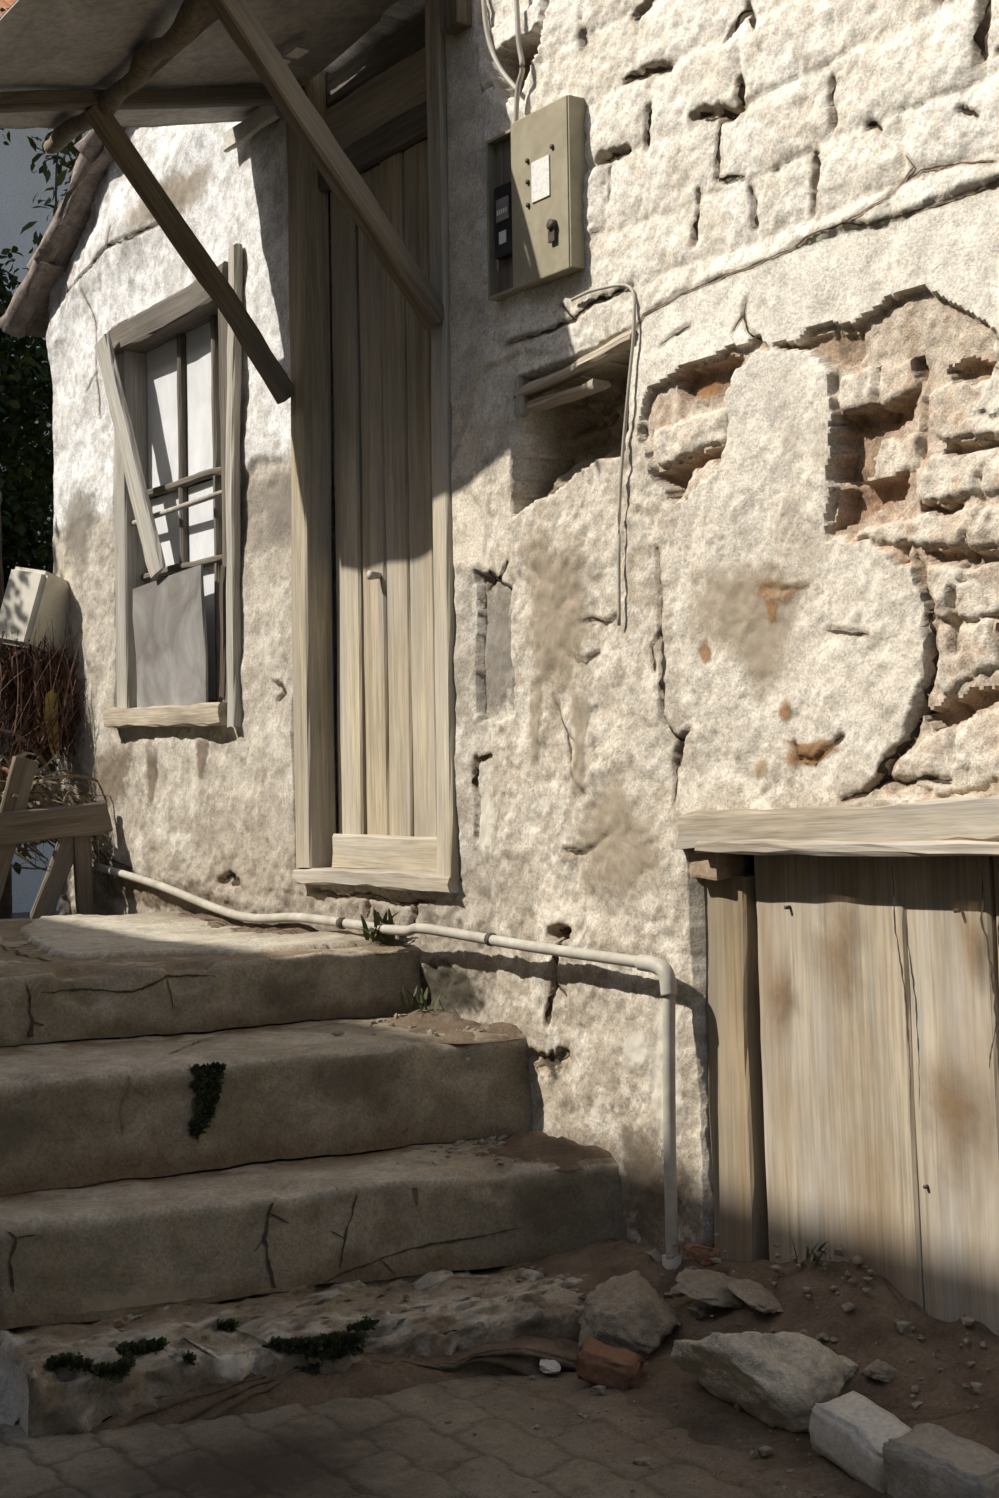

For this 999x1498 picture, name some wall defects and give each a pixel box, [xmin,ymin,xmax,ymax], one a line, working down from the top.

spalling [637,284,999,803]
peeling [486,599,514,697]
crack [652,554,688,804]
crack [826,628,868,636]
crack [841,557,951,801]
crack [796,736,844,765]
crack [0,938,212,1037]
crack [254,1194,522,1297]